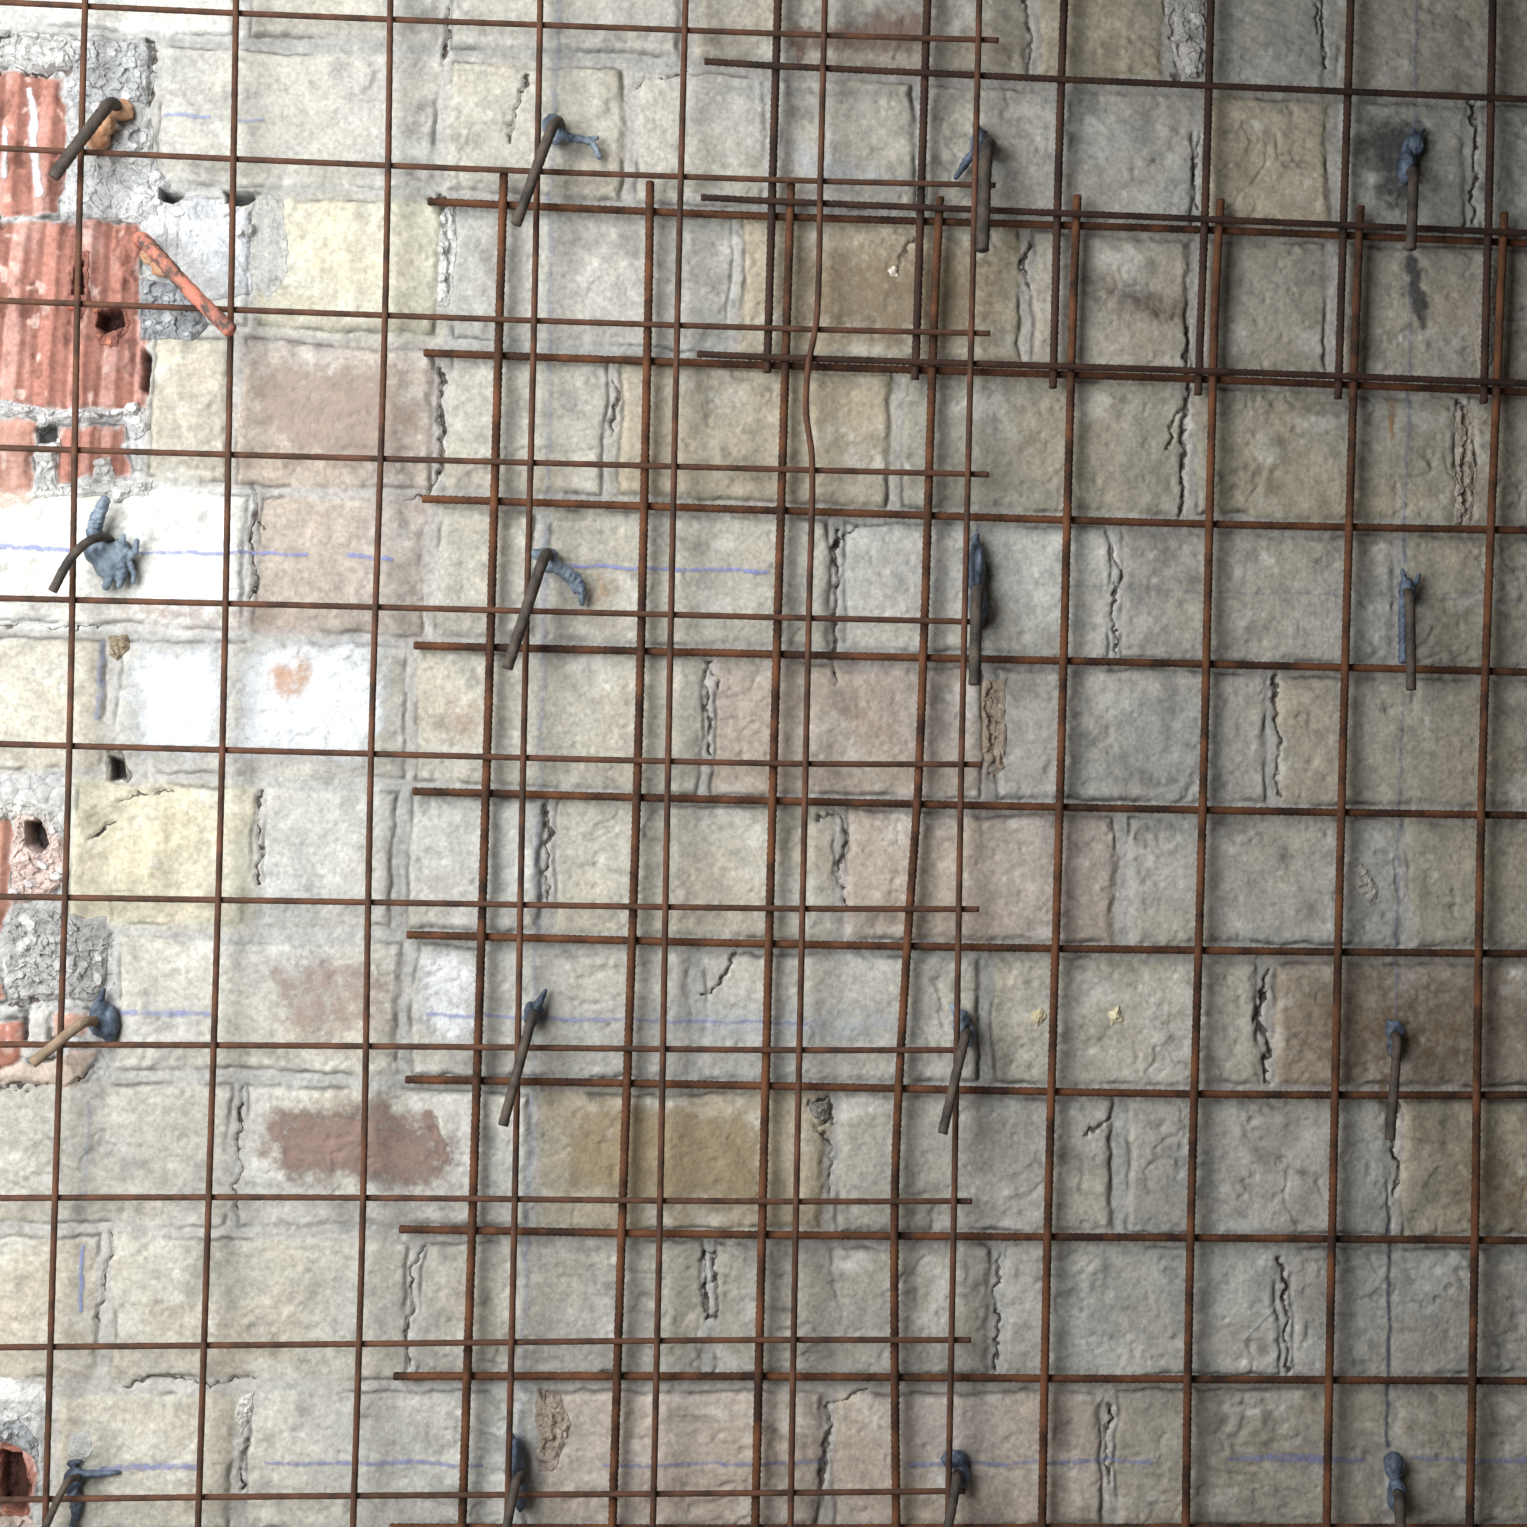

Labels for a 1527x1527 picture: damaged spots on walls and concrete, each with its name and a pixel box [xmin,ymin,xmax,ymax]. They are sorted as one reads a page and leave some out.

spalling [974,0,1527,404]
crack [609,380,621,437]
crack [1165,327,1192,515]
crack [1110,545,1123,654]
spalling [0,0,999,1527]
crack [815,813,849,906]
spalling [953,370,1527,1527]
crack [1252,969,1272,1084]
crack [403,1245,426,1369]
crack [703,1250,719,1320]
crack [1276,1256,1291,1372]
crack [1104,1404,1114,1483]